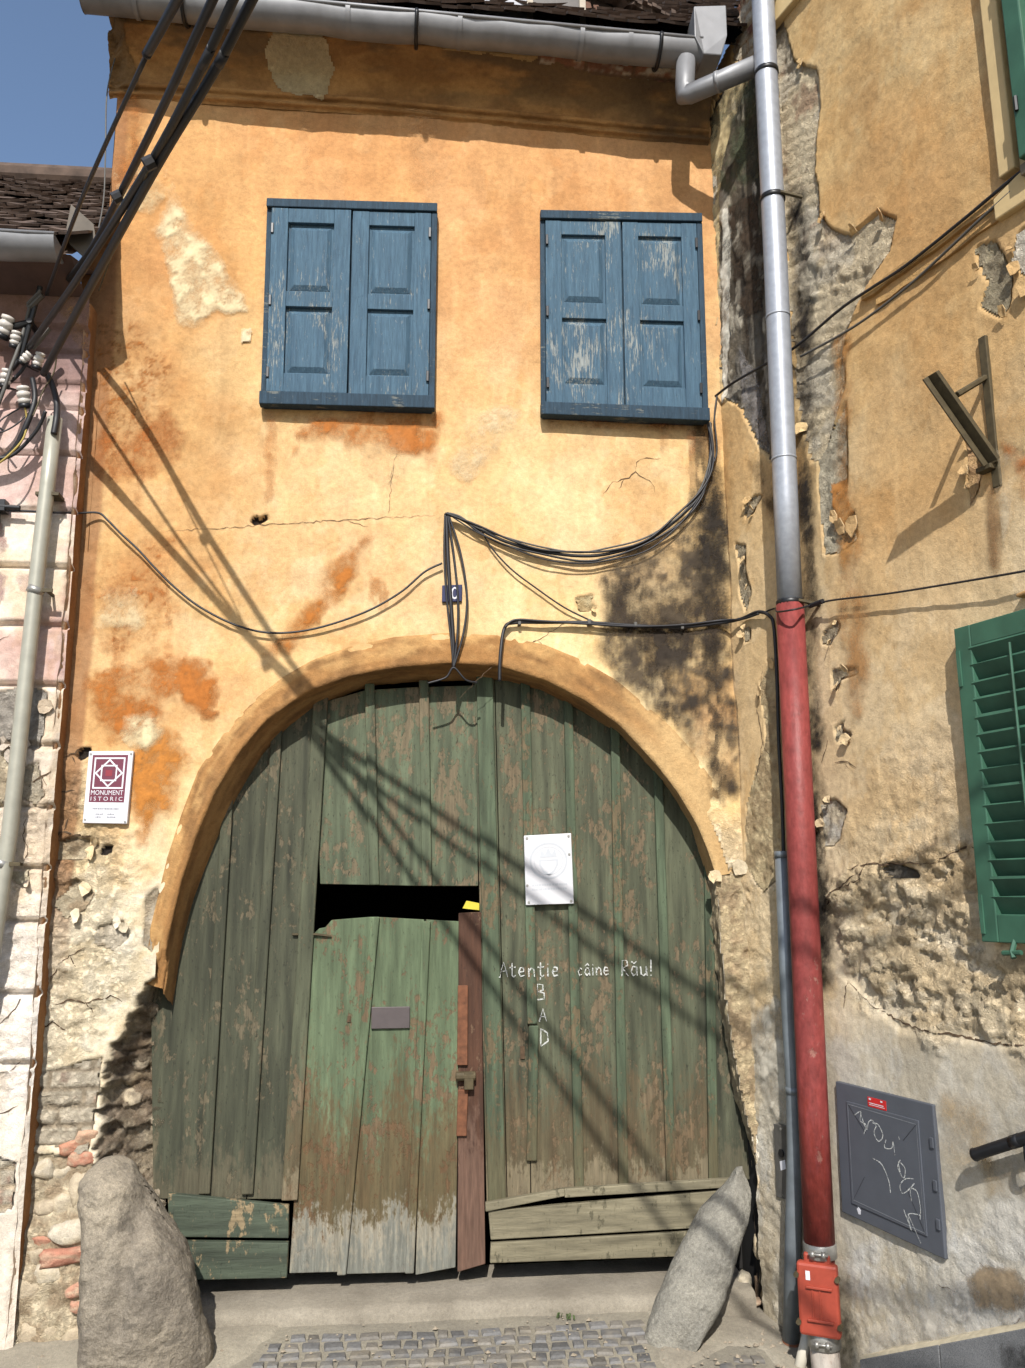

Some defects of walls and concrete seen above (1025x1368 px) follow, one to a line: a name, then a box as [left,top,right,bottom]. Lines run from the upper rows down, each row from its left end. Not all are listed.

peeling [139,192,247,322]
spalling [709,78,772,460]
spalling [776,22,896,554]
flaking render [972,229,1025,318]
crack [169,457,424,532]
damp [601,425,741,798]
flaking render [735,544,751,641]
damp [88,658,218,821]
spalling [708,658,787,1153]
crack [826,846,974,905]
crack [844,982,1022,1046]
spalling [0,1058,101,1343]